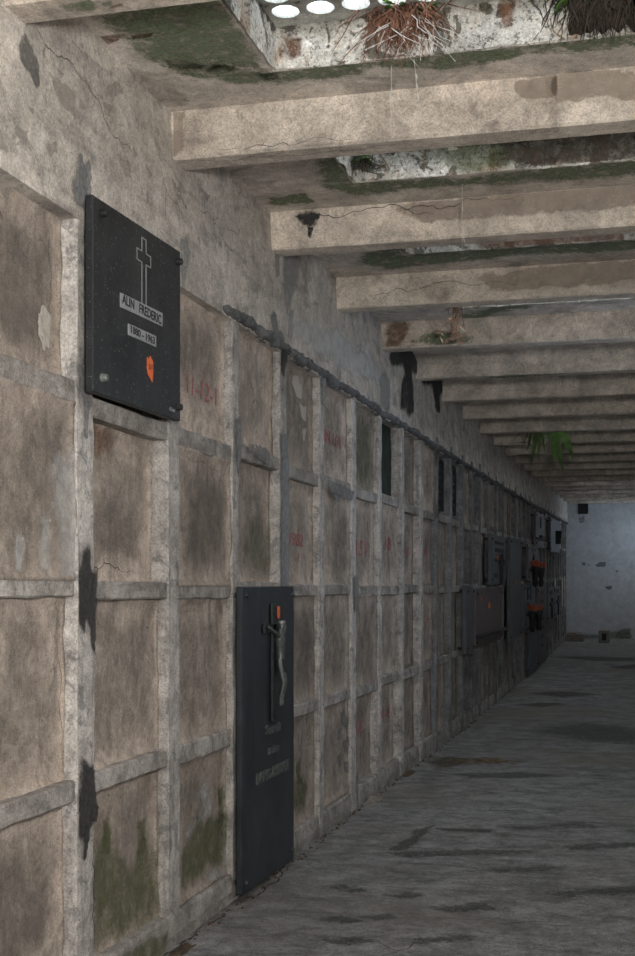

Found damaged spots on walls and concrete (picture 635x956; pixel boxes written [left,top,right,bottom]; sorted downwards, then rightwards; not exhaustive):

leakage [167,61,278,84]
leakage [515,69,635,102]
leakage [398,185,635,222]
leakage [481,261,635,290]